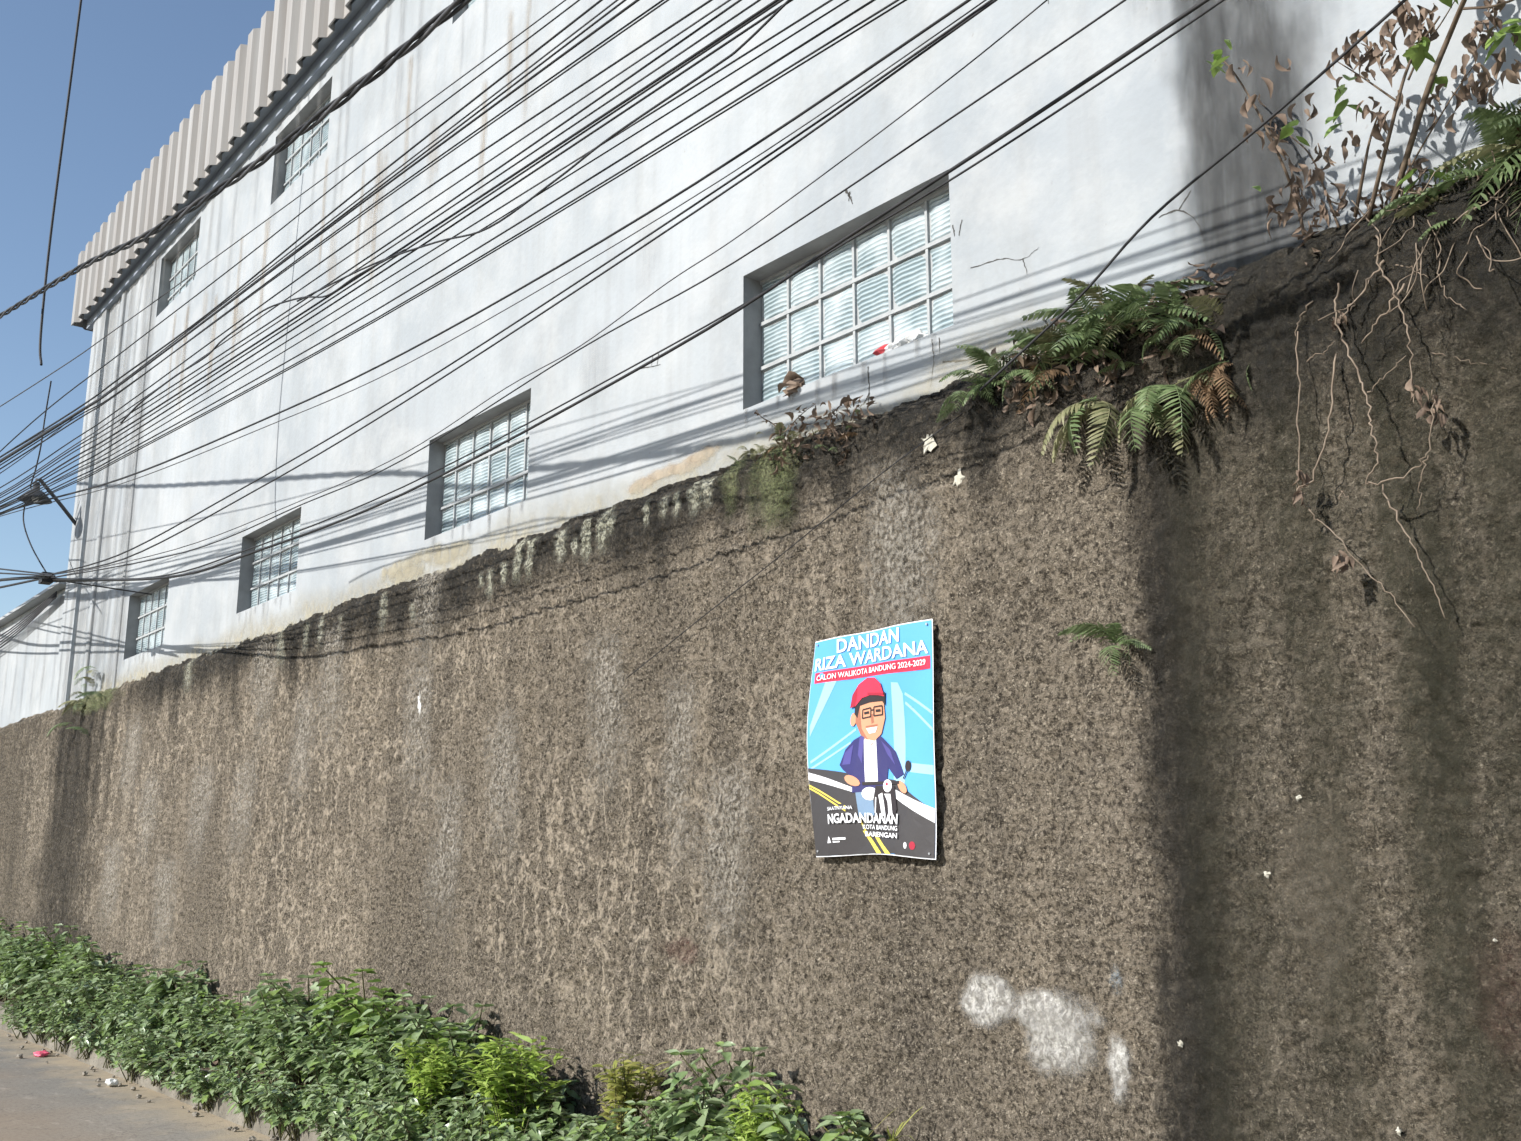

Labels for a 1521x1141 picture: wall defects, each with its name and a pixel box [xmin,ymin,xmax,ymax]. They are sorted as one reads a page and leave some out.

water stain [1182,0,1302,286]
water stain [35,329,1134,946]
water stain [1143,419,1227,1141]
water stain [1369,348,1486,1137]